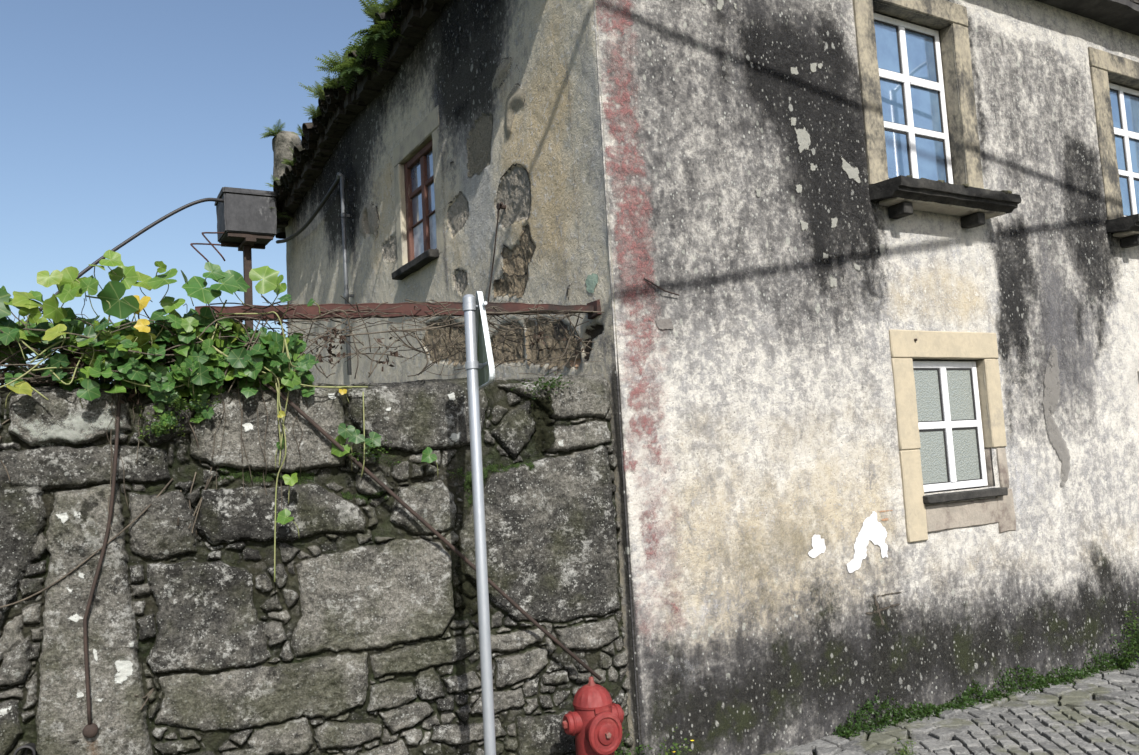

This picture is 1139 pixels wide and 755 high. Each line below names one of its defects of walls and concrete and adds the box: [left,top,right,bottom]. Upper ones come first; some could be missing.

damp [293,111,363,248]
flaking render [466,112,493,178]
damp [739,16,887,304]
flaking render [446,191,469,236]
flaking render [493,163,535,298]
damp [990,137,1119,427]
flaking render [422,316,466,367]
flaking render [490,314,604,372]
peeling [808,534,826,558]
peeling [847,510,893,573]
damp [648,546,1139,755]